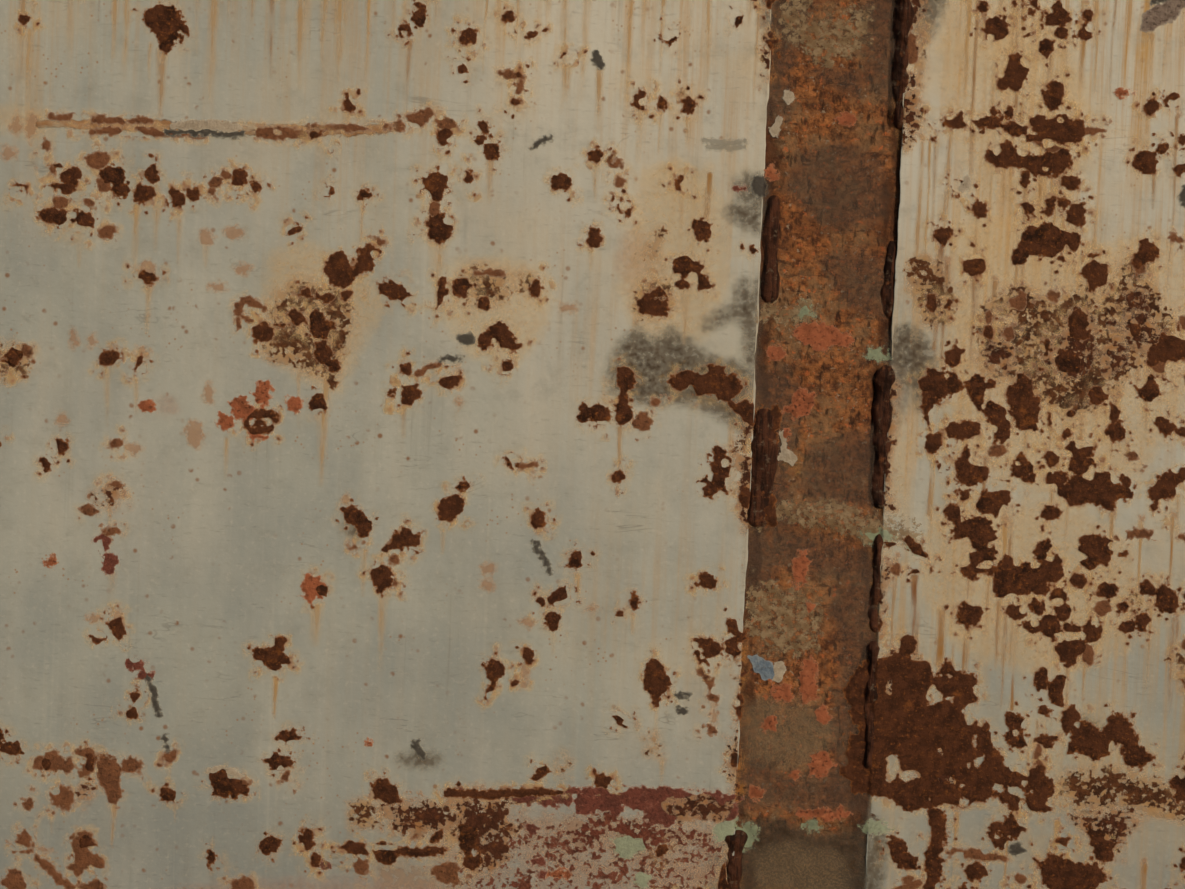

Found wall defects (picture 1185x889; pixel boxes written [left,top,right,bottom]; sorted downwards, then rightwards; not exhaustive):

corrosion [114,0,190,96]
corrosion [9,114,271,246]
corrosion [382,106,502,260]
corrosion [586,141,637,224]
corrosion [633,164,716,321]
corrosion [205,230,555,446]
corrosion [576,358,816,529]
corrosion [788,0,1185,889]
corrosion [522,543,595,636]
corrosion [0,728,183,889]
corrosion [247,635,299,710]
corrosion [258,608,766,889]